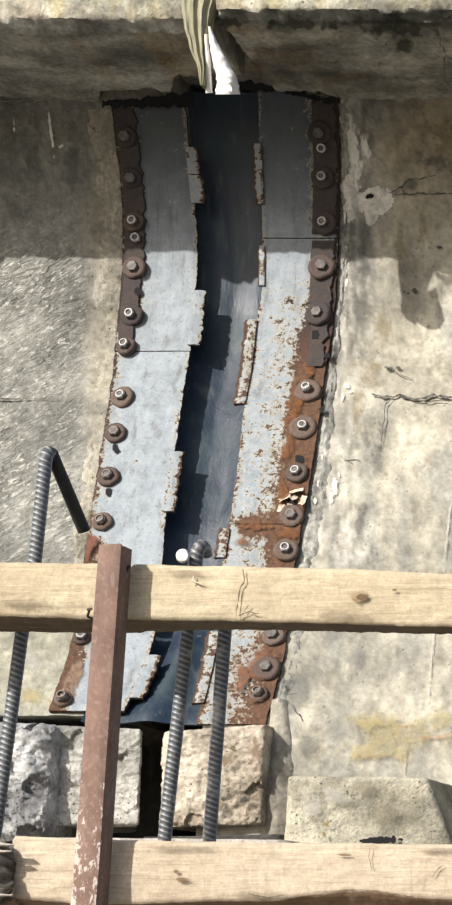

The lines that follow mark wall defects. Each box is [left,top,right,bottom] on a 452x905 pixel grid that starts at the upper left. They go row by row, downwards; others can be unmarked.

crack [389,175,452,196]
spalling [358,186,394,226]
rust [280,394,302,458]
crack [372,371,452,447]
rust [237,523,298,545]
rust [63,660,84,696]
rust [234,646,276,702]